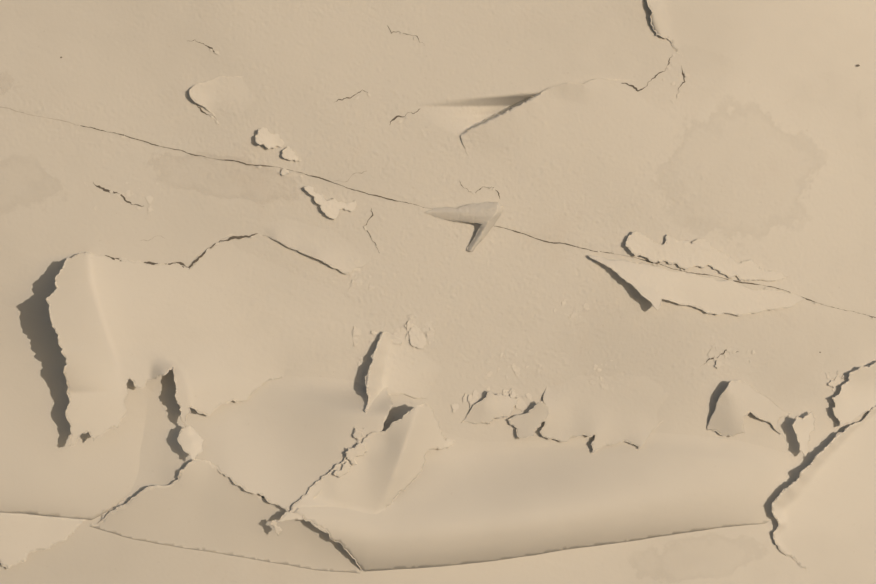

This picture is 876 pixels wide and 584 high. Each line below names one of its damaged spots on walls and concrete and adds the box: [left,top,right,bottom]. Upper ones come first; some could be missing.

crack [615,57,687,98]
peeling [647,0,876,73]
crack [1,107,431,252]
peeling [460,77,681,193]
crack [144,233,258,269]
peeling [261,185,371,274]
peeling [424,201,504,252]
crack [496,226,876,319]
peeling [588,231,806,316]
peeling [0,234,455,574]
peeling [451,369,670,453]
peeling [707,362,876,584]